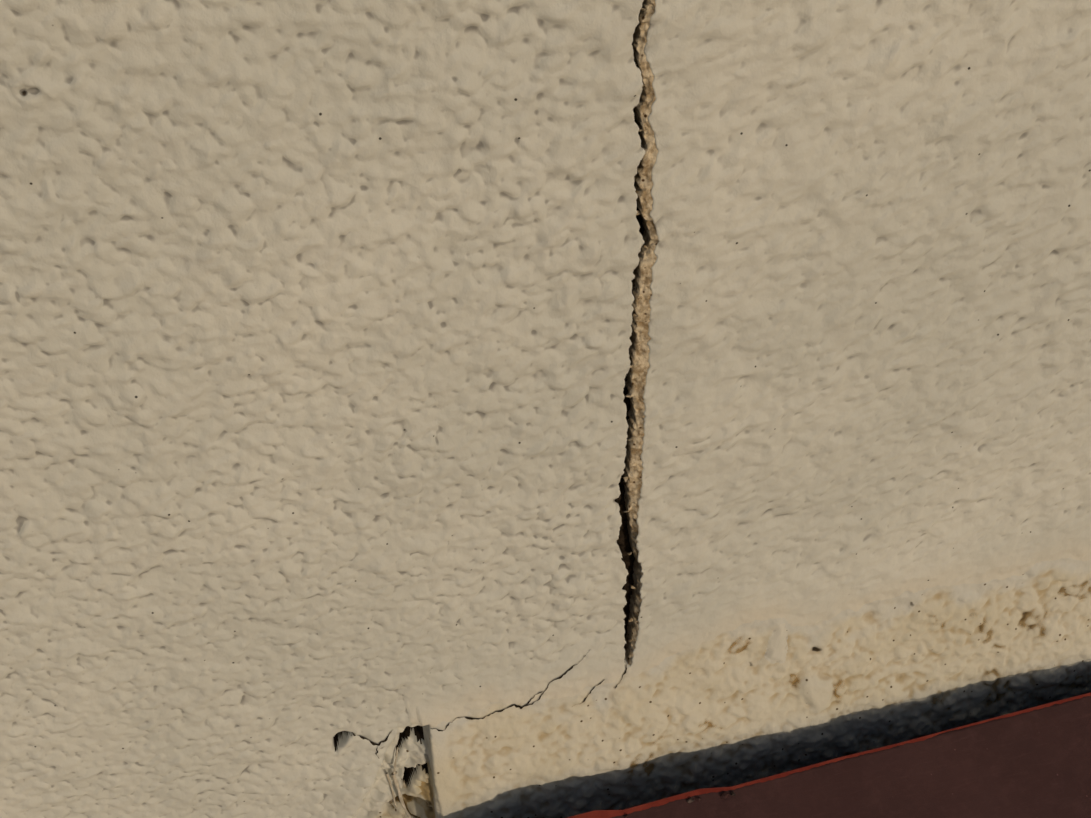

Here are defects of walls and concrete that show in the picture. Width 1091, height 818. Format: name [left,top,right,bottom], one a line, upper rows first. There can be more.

crack [572,0,659,707]
crack [430,651,589,731]
crack [352,731,392,758]
spalling [352,724,436,818]